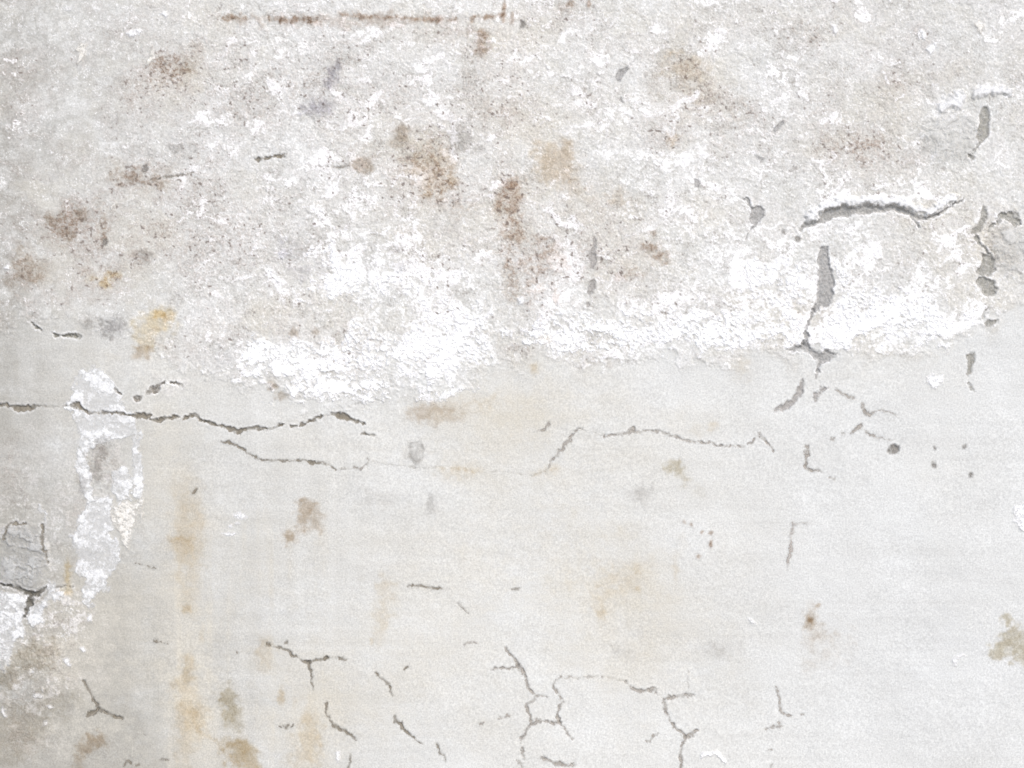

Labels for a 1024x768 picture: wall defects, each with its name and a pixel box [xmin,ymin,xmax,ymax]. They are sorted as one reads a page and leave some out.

spalling [783,201,962,241]
peeling [501,208,1021,411]
crack [0,403,38,412]
crack [71,402,368,470]
crack [541,422,576,467]
crack [603,426,774,452]
peeling [64,368,179,621]
crack [0,521,49,617]
crack [82,680,123,720]
crack [266,641,357,768]
crack [479,647,574,766]
crack [630,687,699,768]